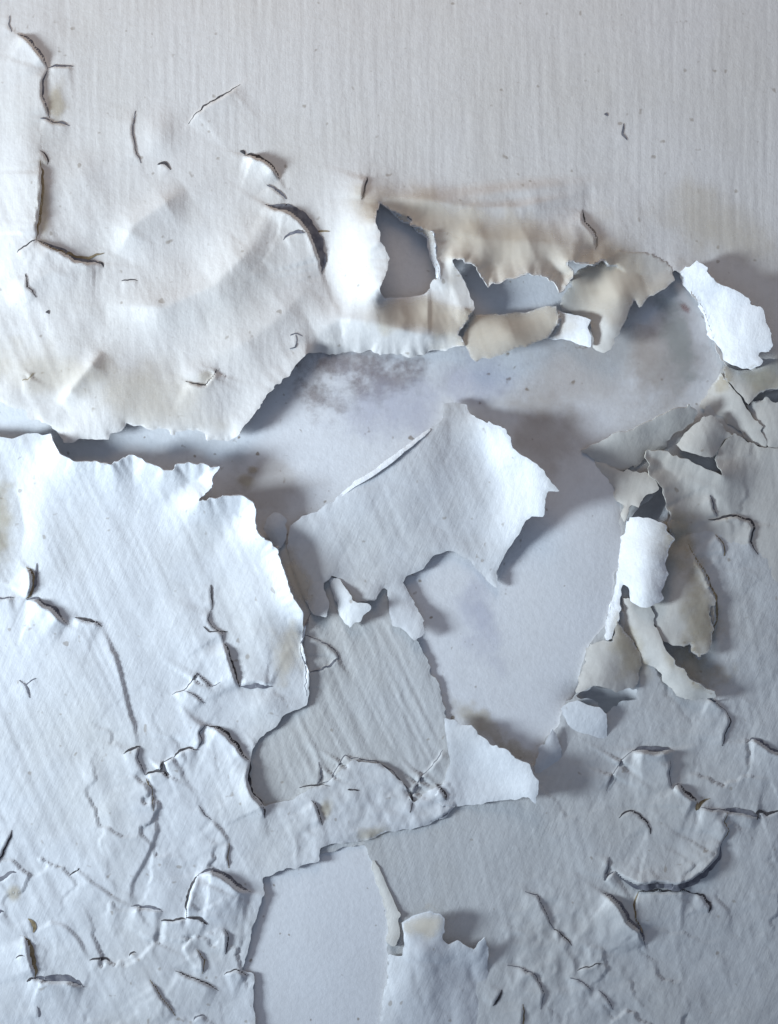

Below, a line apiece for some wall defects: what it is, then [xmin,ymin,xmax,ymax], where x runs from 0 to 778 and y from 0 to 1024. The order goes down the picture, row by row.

crack [17,150,138,314]
crack [240,150,330,272]
damp [381,301,451,332]
damp [391,200,568,275]
damp [467,317,552,347]
damp [581,251,642,303]
peeling [0,152,778,738]
crack [123,585,273,818]
peeling [434,718,562,807]
crack [602,746,778,944]
crack [16,918,136,987]
peeling [372,861,489,1024]